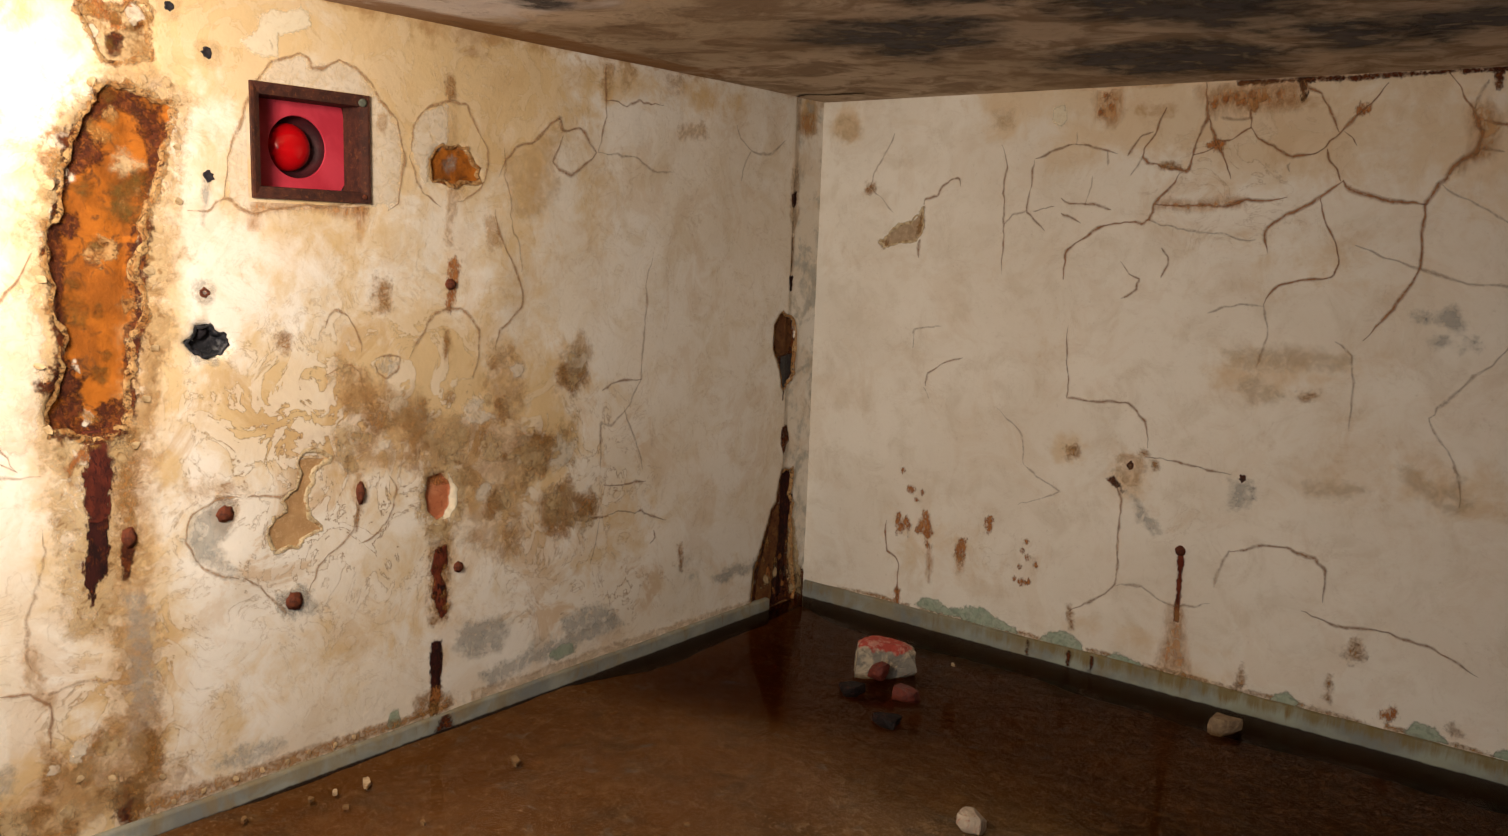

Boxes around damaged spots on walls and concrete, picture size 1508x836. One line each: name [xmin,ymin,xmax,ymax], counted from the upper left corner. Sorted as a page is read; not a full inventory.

water stain [520,0,570,10]
mould [791,0,1004,62]
mould [1046,0,1508,78]
flaking render [26,0,489,472]
corrosion [428,143,483,190]
crack [1001,72,1508,341]
crack [0,256,45,469]
flaking render [773,310,797,400]
corrosion [50,422,135,636]
flaking render [185,447,333,613]
corrosion [109,541,452,825]
crack [1231,545,1475,676]